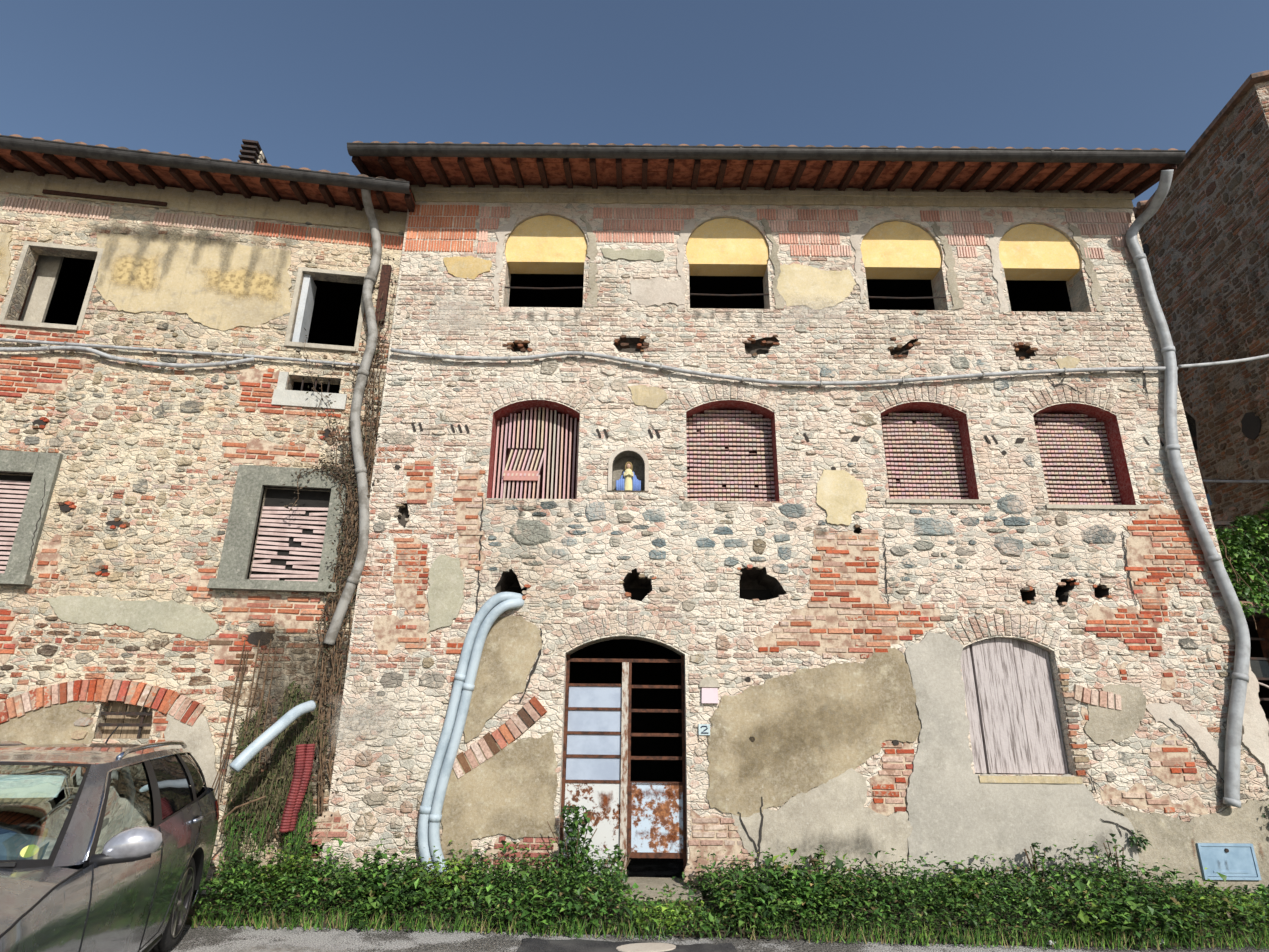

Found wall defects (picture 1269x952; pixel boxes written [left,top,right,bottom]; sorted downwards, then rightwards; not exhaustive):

peeling [94,233,292,331]
spalling [614,335,649,354]
spalling [742,335,780,357]
spalling [887,337,921,358]
flaking render [373,455,486,656]
spalling [495,569,531,600]
spalling [619,568,657,601]
peeling [684,469,1269,900]
peeling [440,615,559,873]
corrosion [627,783,684,859]